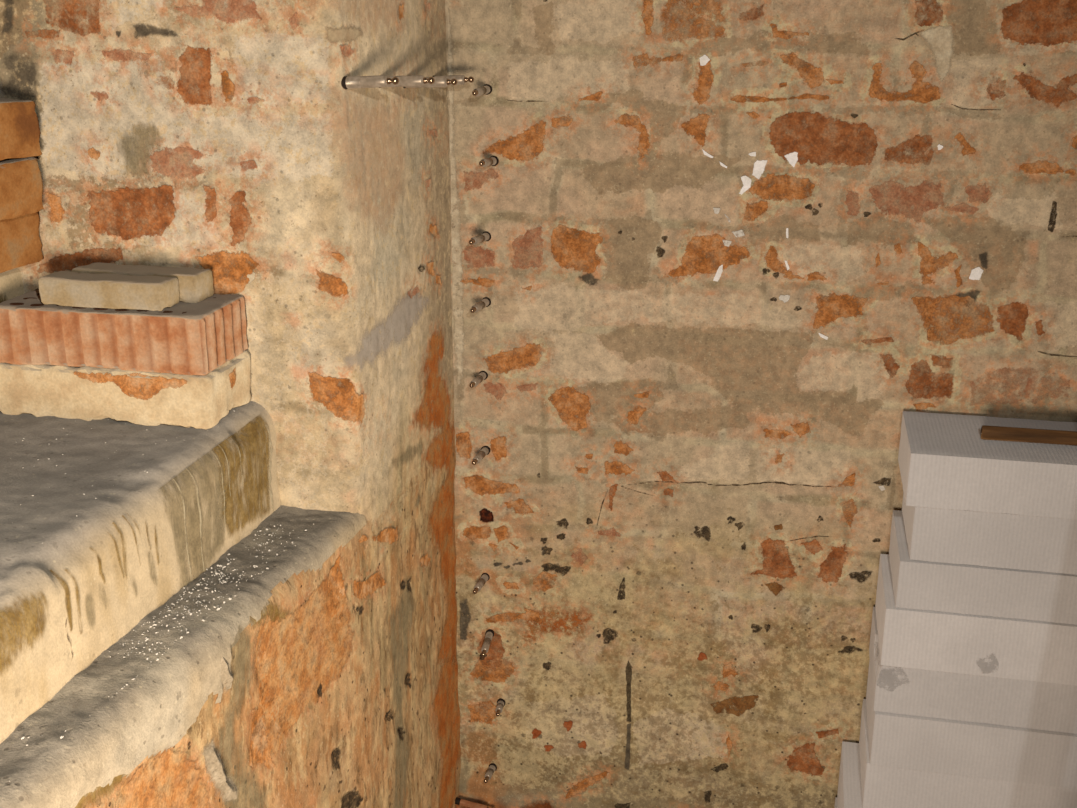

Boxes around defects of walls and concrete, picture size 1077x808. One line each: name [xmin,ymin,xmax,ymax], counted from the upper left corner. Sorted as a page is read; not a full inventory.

flaking render [1000,0,1077,47]
flaking render [161,45,235,106]
flaking render [730,53,941,221]
flaking render [37,147,217,274]
flaking render [196,191,260,295]
flaking render [510,224,603,273]
flaking render [308,372,365,424]
damp [160,417,274,587]
crack [639,481,830,496]
flaking render [751,524,797,596]
flaking render [801,539,872,583]
flaking render [249,556,386,770]